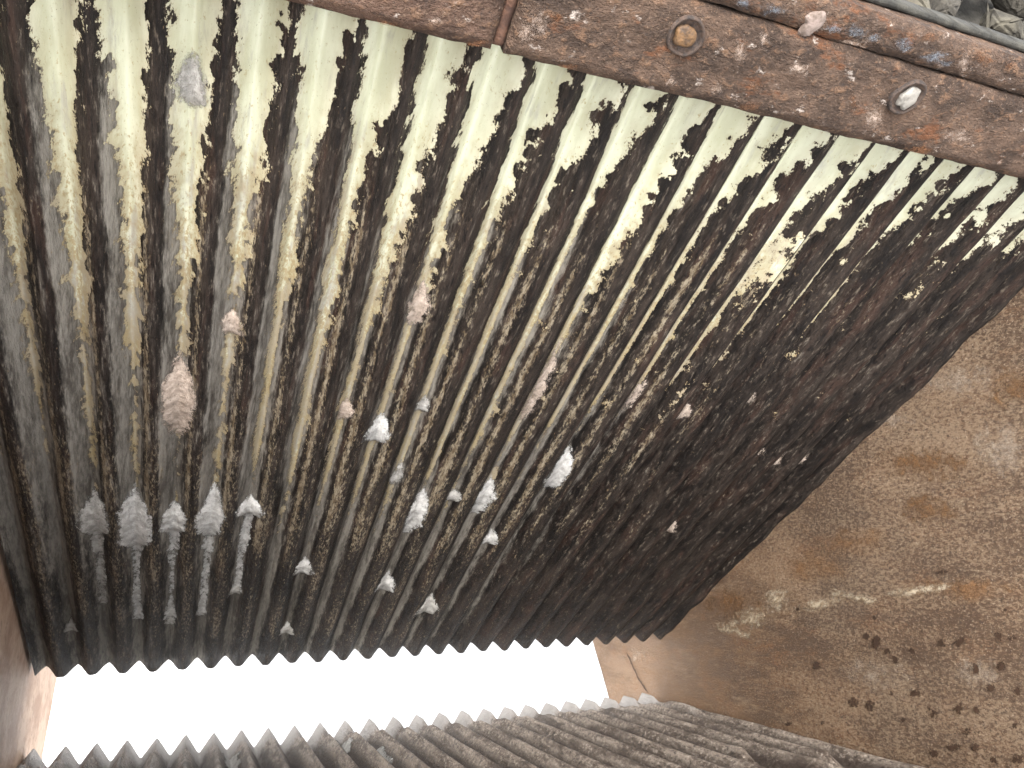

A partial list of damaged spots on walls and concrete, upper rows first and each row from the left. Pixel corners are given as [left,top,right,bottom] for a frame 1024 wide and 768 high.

peeling [0,66,52,468]
peeling [19,0,152,491]
peeling [162,0,1024,534]
leakage [90,534,109,604]
leakage [131,545,144,619]
leakage [163,530,181,620]
leakage [196,535,214,615]
leakage [232,513,254,587]